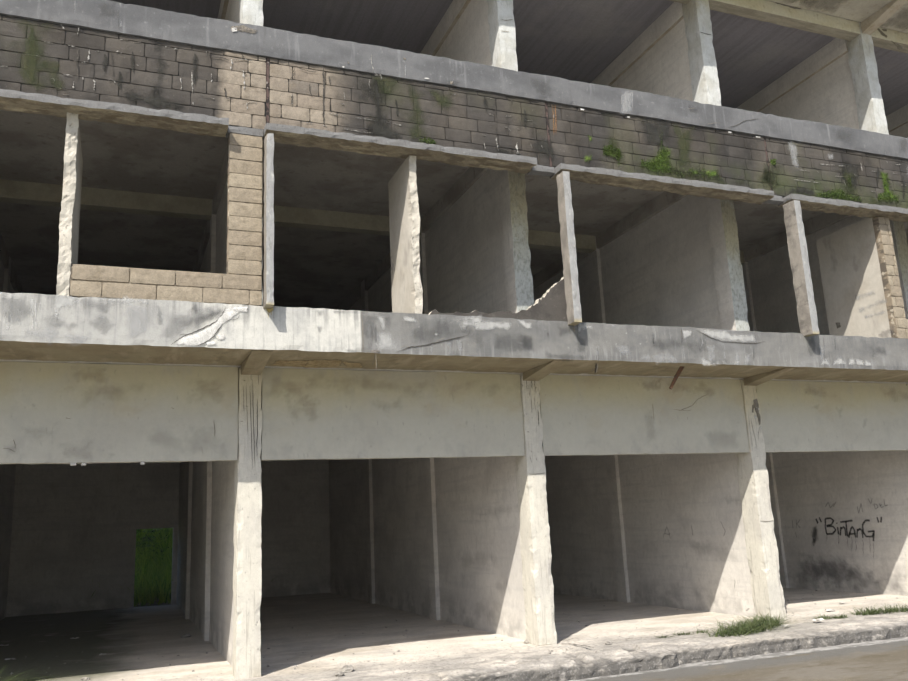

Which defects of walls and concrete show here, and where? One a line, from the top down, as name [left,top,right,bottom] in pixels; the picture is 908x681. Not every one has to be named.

leakage [82,39,181,108]
spalling [177,307,247,346]
crack [361,312,468,369]
spalling [752,399,762,430]